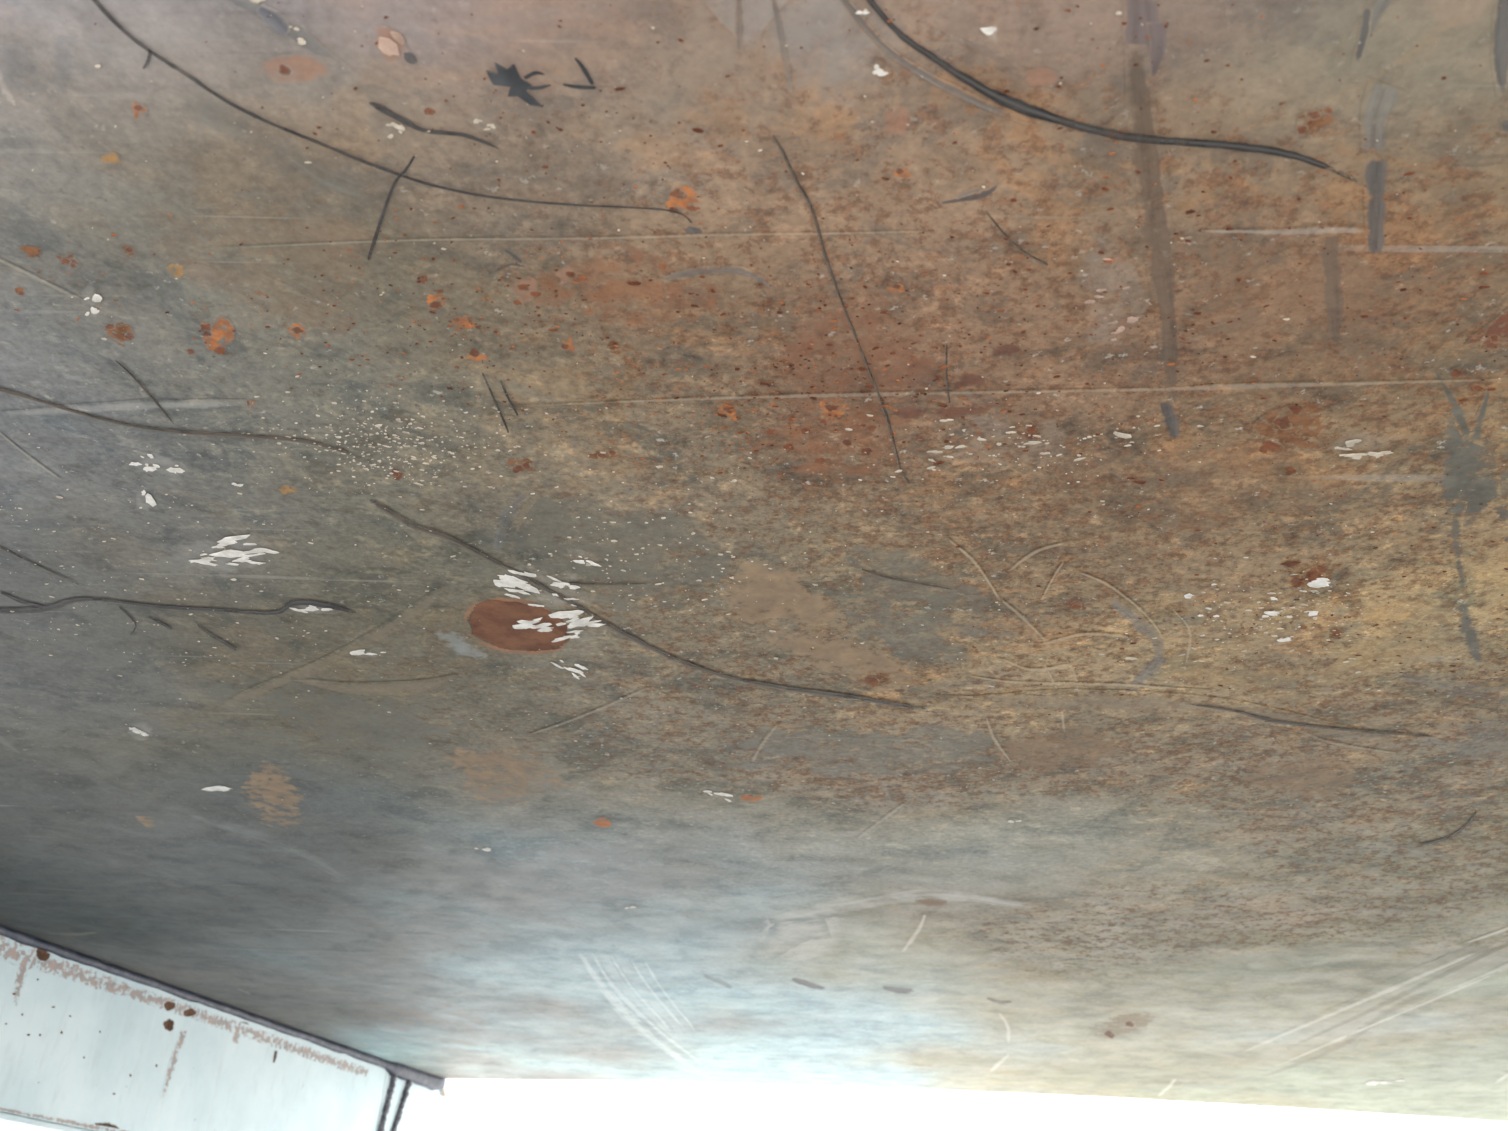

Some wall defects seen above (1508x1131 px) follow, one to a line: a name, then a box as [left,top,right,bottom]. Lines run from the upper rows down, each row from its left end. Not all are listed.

crack [92,0,692,260]
crack [841,0,1351,179]
corrosion [19,245,81,269]
corrosion [104,321,136,347]
crack [0,361,370,461]
corrosion [116,187,482,356]
water stain [1121,0,1185,440]
crack [0,547,356,650]
corrosion [434,596,573,661]
crack [371,500,930,712]
water stain [1391,498,1508,768]
corrosion [0,935,369,1098]